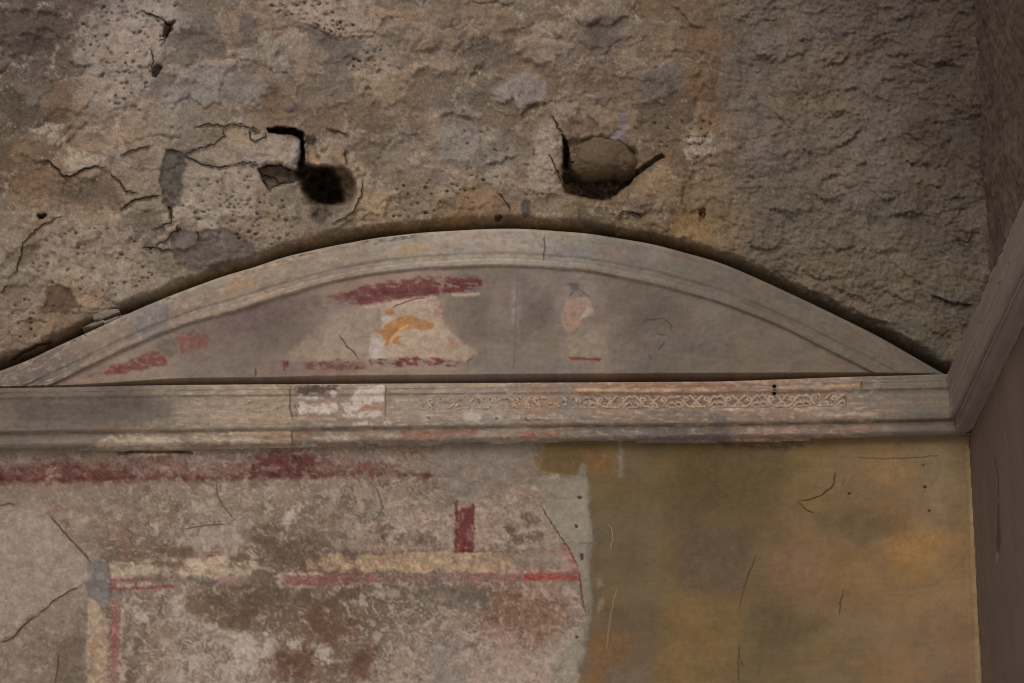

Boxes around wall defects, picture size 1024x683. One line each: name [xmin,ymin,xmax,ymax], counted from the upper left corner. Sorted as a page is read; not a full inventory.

crack [142,10,174,68]
spalling [521,83,615,204]
crack [34,120,364,252]
crack [0,216,61,293]
peeling [0,385,425,495]
crack [798,455,938,514]
crack [0,587,78,643]
crack [50,515,92,563]
crack [540,505,617,650]
crack [53,653,61,683]